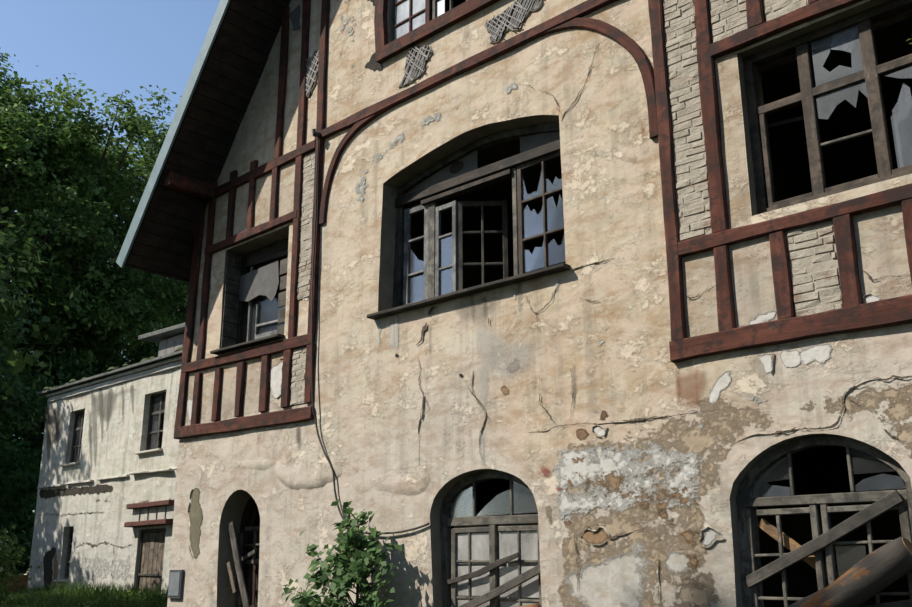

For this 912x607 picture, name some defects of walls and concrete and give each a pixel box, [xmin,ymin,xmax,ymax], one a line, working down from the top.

spalling [336,0,383,71]
crack [526,44,599,119]
crack [526,259,608,328]
crack [416,306,438,461]
crack [469,372,489,458]
crack [530,355,698,471]
peeling [758,343,832,375]
peeling [800,382,912,458]
spalling [39,484,117,502]
peeling [545,370,779,607]